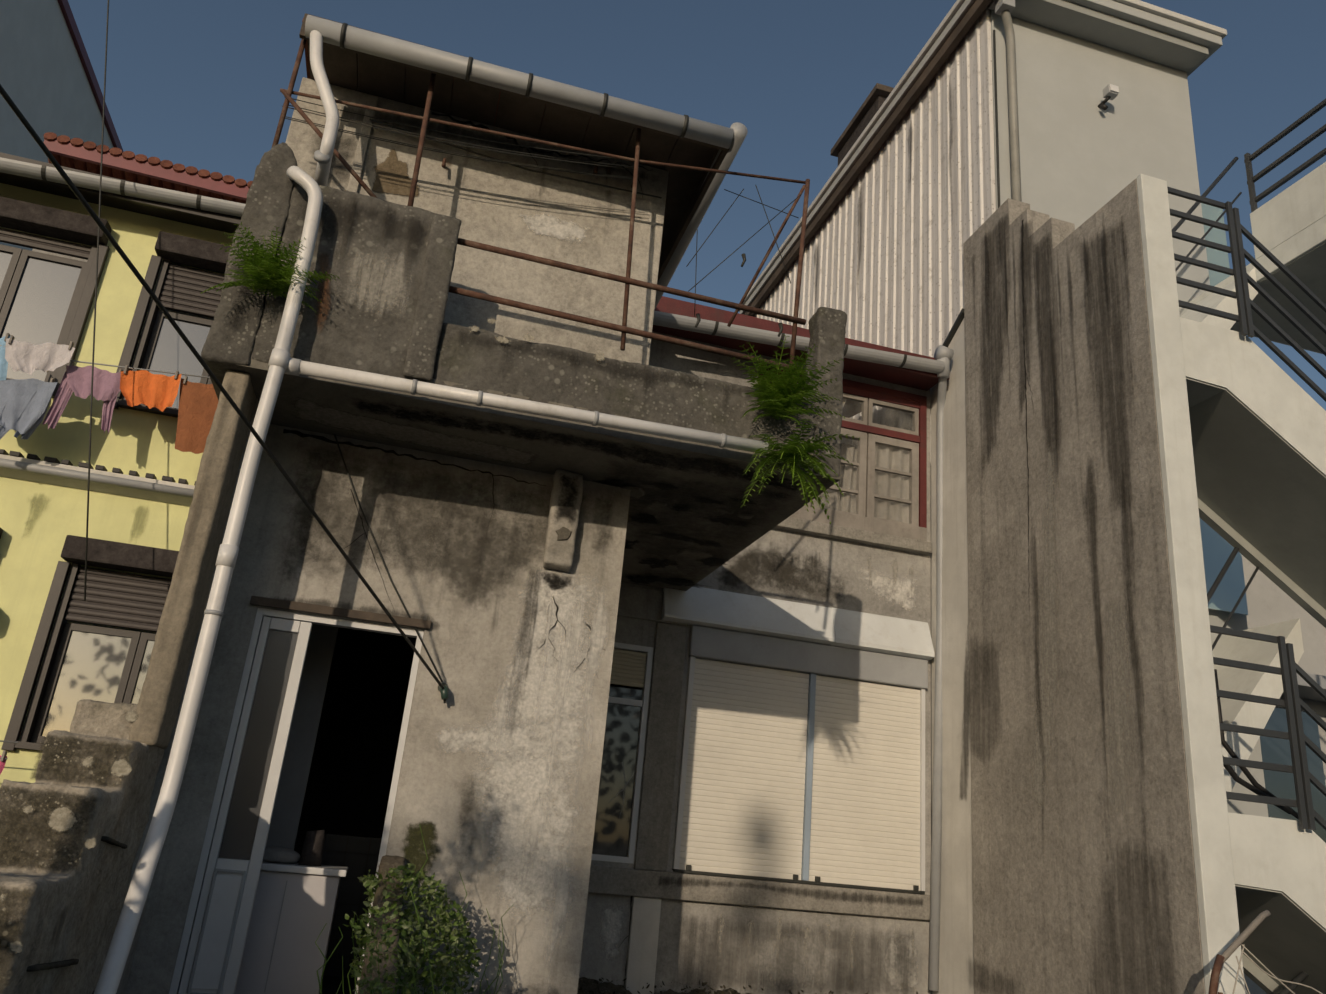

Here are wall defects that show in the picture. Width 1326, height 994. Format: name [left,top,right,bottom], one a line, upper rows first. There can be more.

damp [291,448,607,960]
crack [542,596,605,677]
damp [724,553,842,598]
damp [961,662,970,797]
damp [982,220,1141,812]